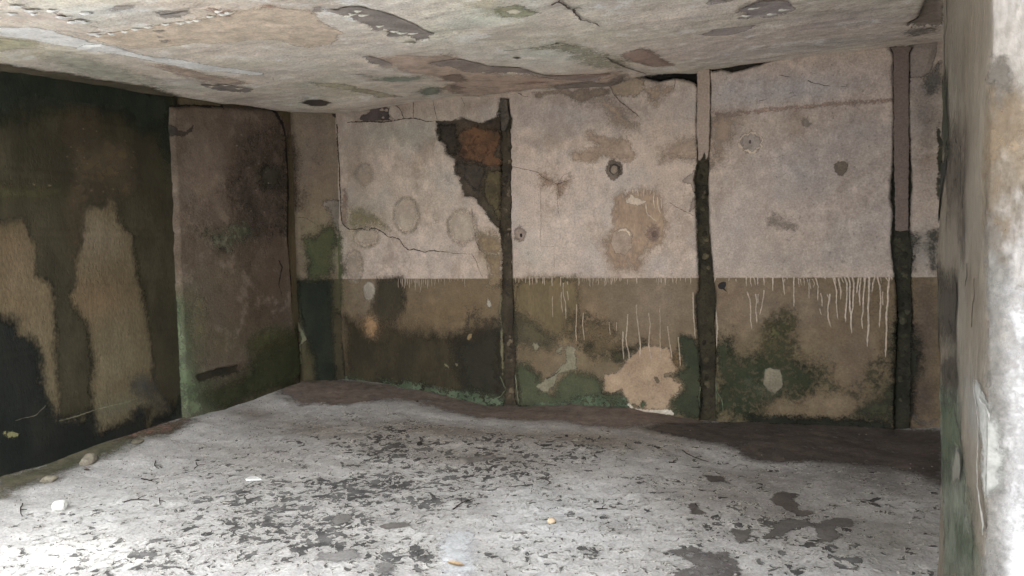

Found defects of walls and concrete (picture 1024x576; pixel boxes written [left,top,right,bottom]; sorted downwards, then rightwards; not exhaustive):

leakage [0,64,177,106]
peeling [0,1,434,93]
peeling [360,107,393,121]
crack [336,102,503,281]
spalling [435,112,512,229]
crack [551,0,600,27]
leakage [0,102,183,477]
leakage [341,189,681,406]
peeling [603,345,682,415]
leakage [714,276,898,391]
leakage [982,87,1024,446]